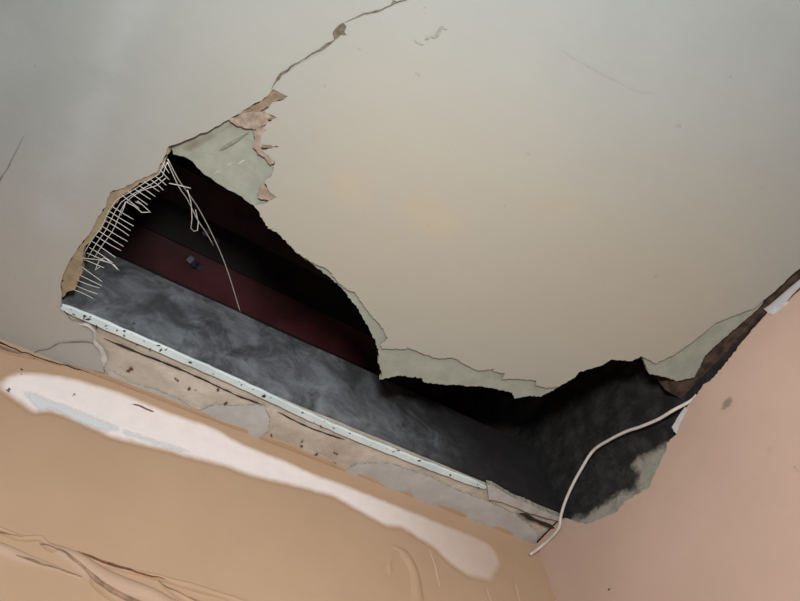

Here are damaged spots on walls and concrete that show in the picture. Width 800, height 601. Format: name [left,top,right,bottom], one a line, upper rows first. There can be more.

crack [271,0,406,91]
peeling [66,312,767,545]